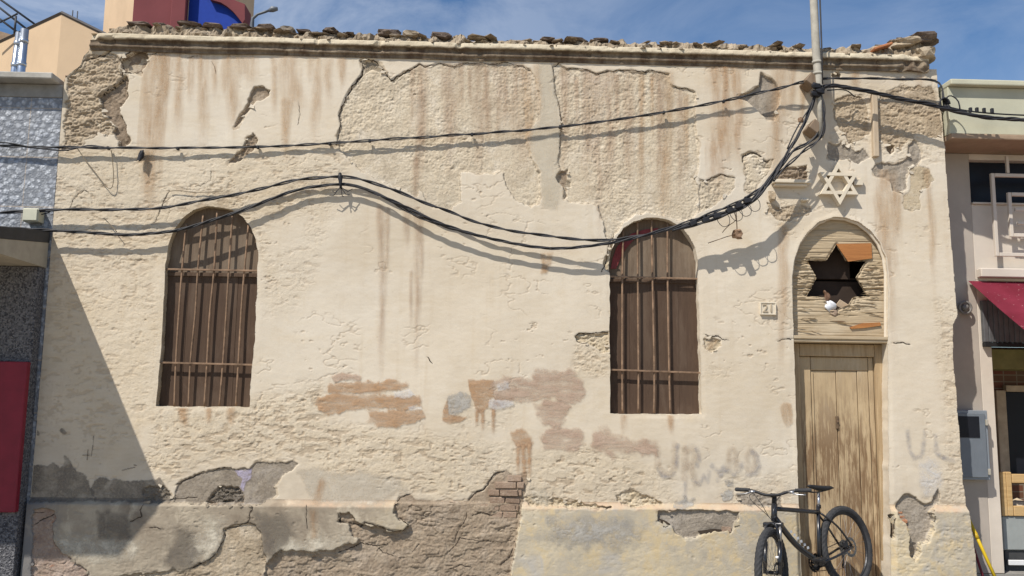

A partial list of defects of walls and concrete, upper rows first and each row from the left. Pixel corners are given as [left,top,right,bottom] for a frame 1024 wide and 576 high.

flaking render [62,51,149,150]
flaking render [229,134,258,163]
flaking render [235,86,270,127]
flaking render [337,59,541,210]
crack [337,59,692,152]
flaking render [553,63,735,271]
flaking render [740,73,780,121]
flaking render [827,85,942,210]
flaking render [575,333,610,353]
flaking render [30,461,298,576]
flaking render [122,370,782,576]
flaking render [895,489,940,560]